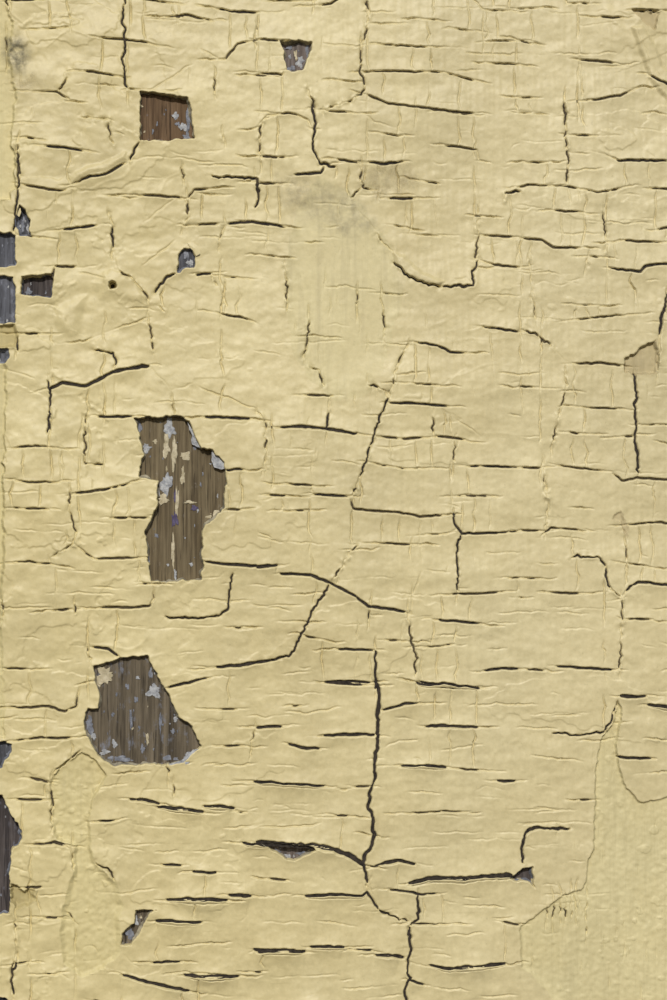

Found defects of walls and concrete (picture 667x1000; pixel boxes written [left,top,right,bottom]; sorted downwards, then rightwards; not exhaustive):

crack [46,0,278,98]
peeling [140,92,194,141]
peeling [279,40,312,72]
crack [143,1,472,238]
crack [394,92,667,288]
peeling [0,0,53,768]
crack [17,325,154,448]
peeling [135,416,227,583]
crack [205,323,667,598]
peeling [0,795,37,914]
peeling [51,656,201,978]
crack [102,521,667,1000]